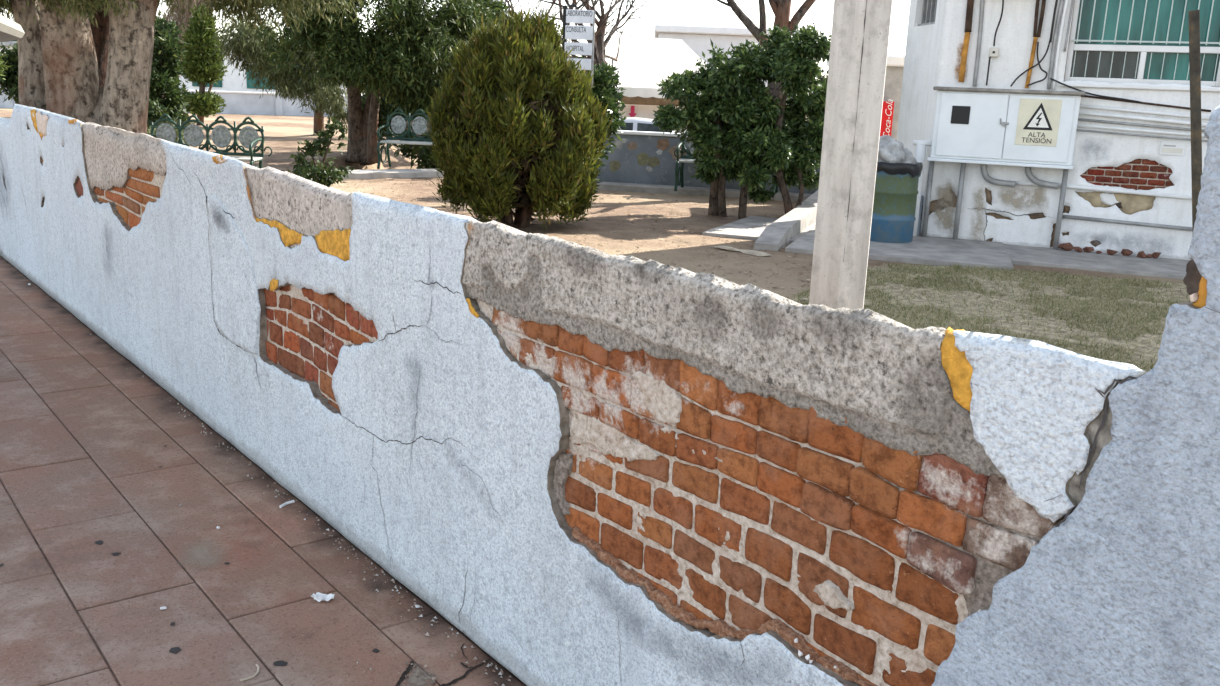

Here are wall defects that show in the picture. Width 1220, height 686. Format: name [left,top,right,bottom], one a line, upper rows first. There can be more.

flaking render [68,119,167,228]
crack [170,152,274,406]
flaking render [245,165,362,261]
flaking render [263,278,378,412]
flaking render [1029,159,1174,247]
crack [341,265,508,566]
flaking render [462,220,1063,686]
flaking render [1068,396,1113,508]